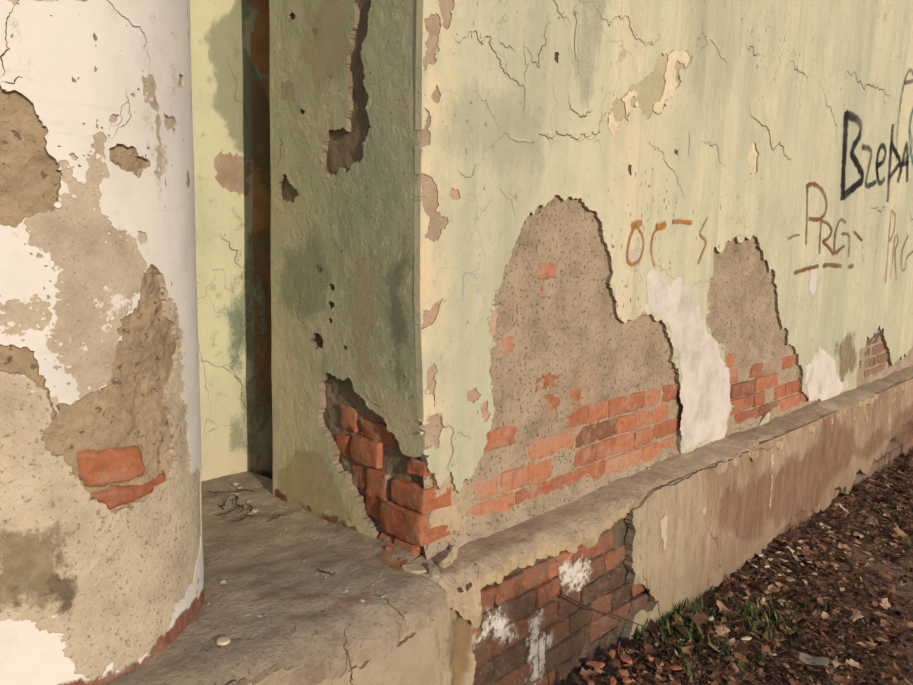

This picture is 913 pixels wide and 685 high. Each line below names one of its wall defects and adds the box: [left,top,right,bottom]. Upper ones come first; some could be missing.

crack [0,6,22,84]
flaking render [320,0,371,178]
crack [453,0,661,178]
peeling [214,151,253,197]
peeling [0,71,201,682]
flaking render [323,196,682,560]
flaking render [706,237,819,437]
damp [0,527,75,612]
crack [344,628,353,685]
damp [474,606,553,685]
flaking render [457,517,650,685]
damp [558,559,591,591]